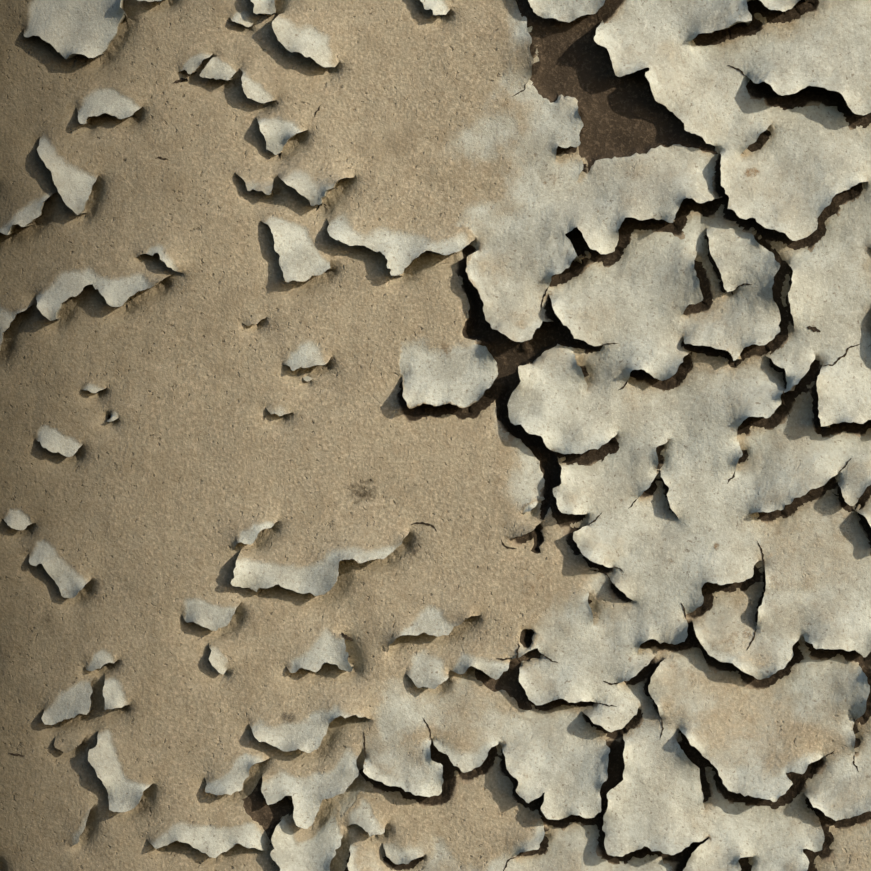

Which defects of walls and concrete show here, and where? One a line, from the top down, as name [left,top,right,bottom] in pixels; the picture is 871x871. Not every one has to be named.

peeling [22,0,128,59]
peeling [230,0,340,67]
peeling [178,52,308,155]
peeling [0,129,99,235]
peeling [0,238,182,351]
peeling [261,212,331,282]
peeling [327,207,476,276]
peeling [363,0,871,871]
peeling [231,517,410,596]
peeling [42,644,153,812]
peeling [249,699,371,753]
peeling [148,734,673,871]